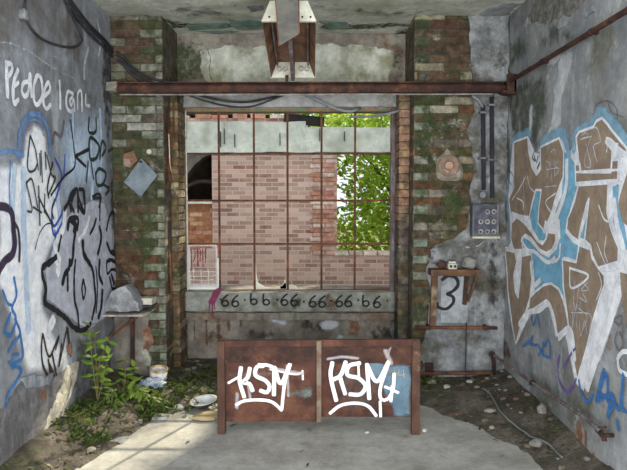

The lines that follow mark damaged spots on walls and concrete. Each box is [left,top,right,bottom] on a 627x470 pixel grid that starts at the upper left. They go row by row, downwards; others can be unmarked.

damp [96,19,111,141]
peeling [186,43,396,82]
peeling [430,241,482,263]